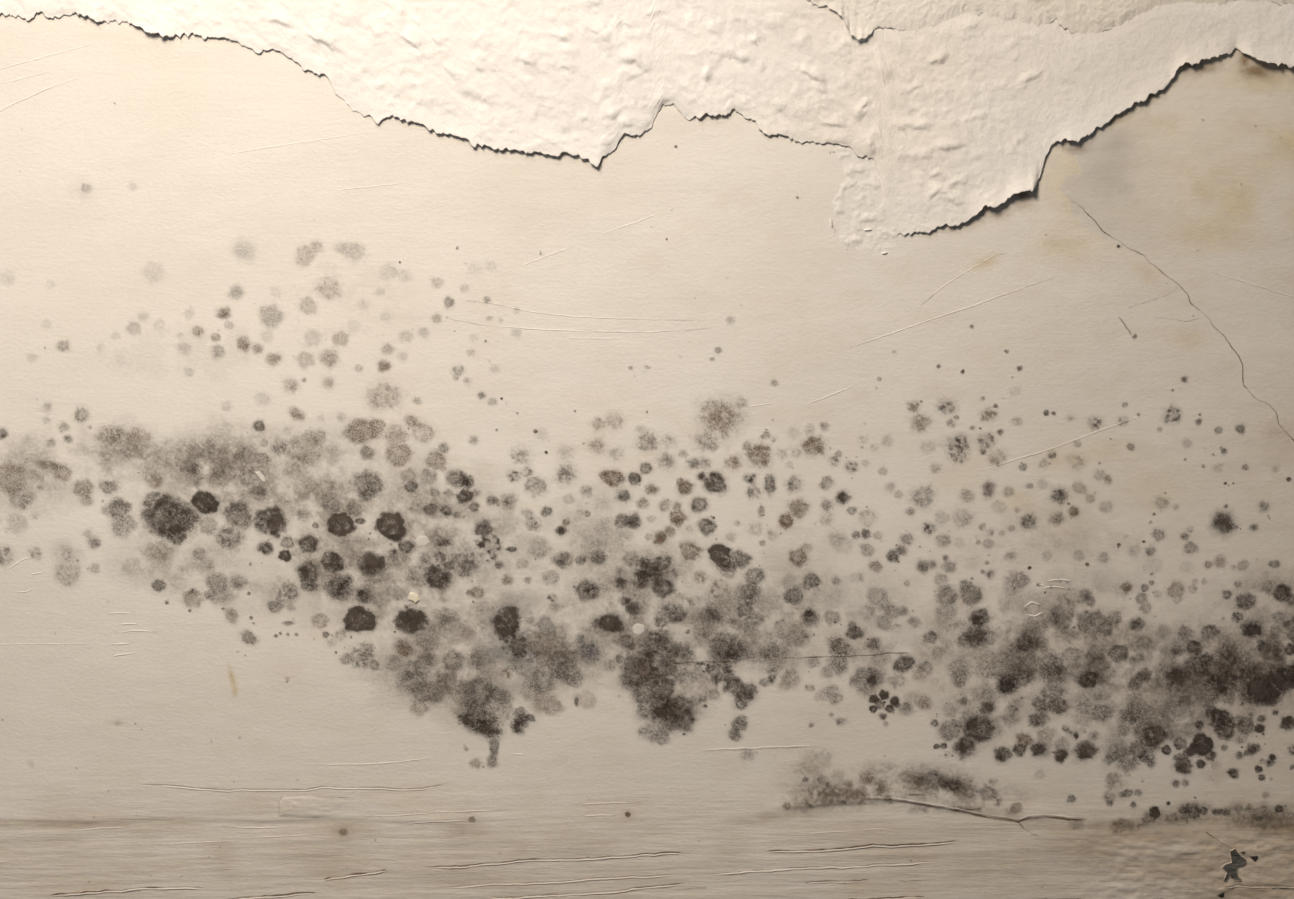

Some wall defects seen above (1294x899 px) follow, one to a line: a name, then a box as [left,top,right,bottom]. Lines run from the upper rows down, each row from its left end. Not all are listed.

damp [347,419,378,456]
damp [803,437,856,471]
damp [950,405,1002,464]
damp [109,444,516,632]
damp [732,445,806,527]
damp [1053,490,1078,522]
damp [1213,505,1234,532]
damp [394,457,784,765]
damp [785,575,835,621]
damp [832,622,879,664]
damp [856,572,1294,827]
damp [785,777,886,808]